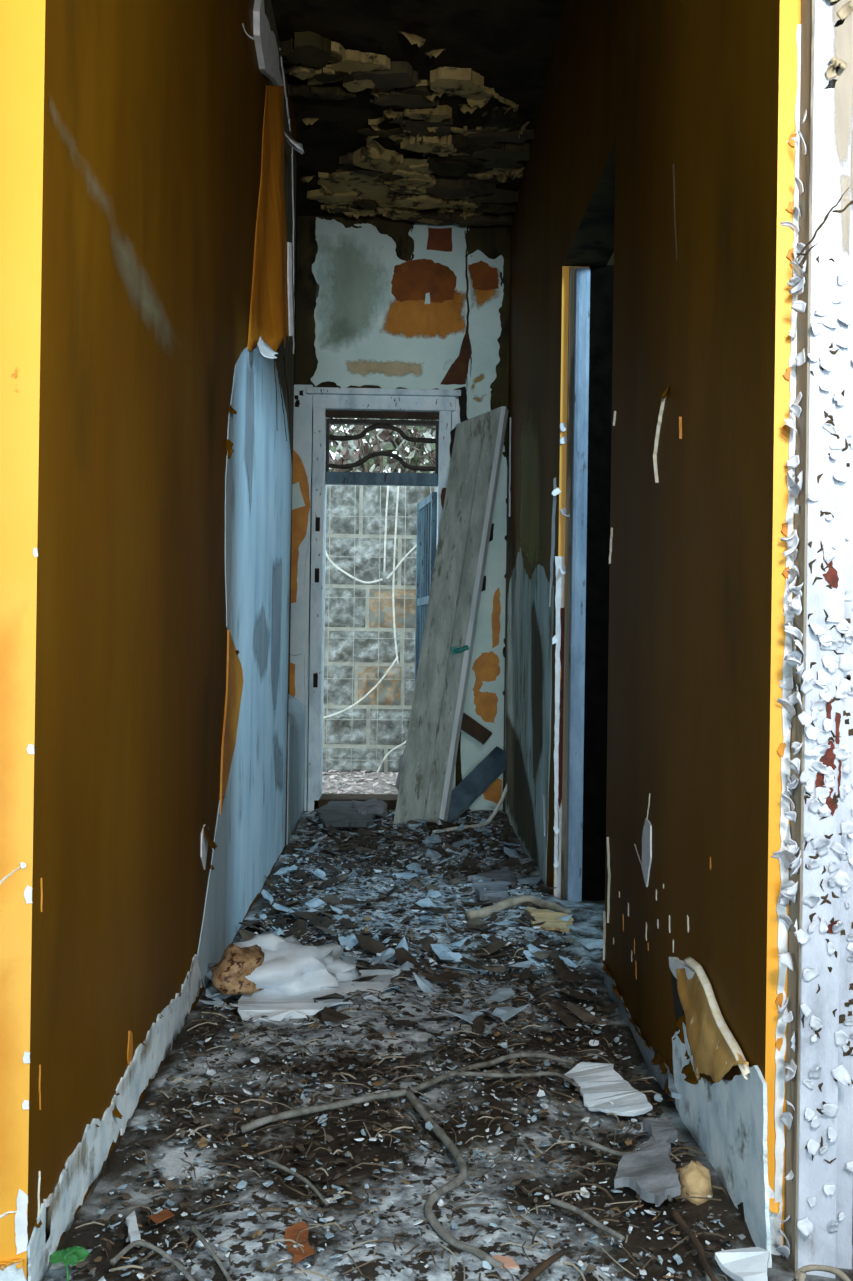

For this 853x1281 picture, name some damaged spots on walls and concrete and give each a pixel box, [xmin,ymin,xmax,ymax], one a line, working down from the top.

peeling [264,0,534,462]
peeling [807,271,853,406]
peeling [823,423,853,482]
peeling [833,0,853,255]
peeling [0,336,310,1281]
peeling [460,440,570,899]
peeling [796,589,853,962]
flaking render [602,837,853,1268]